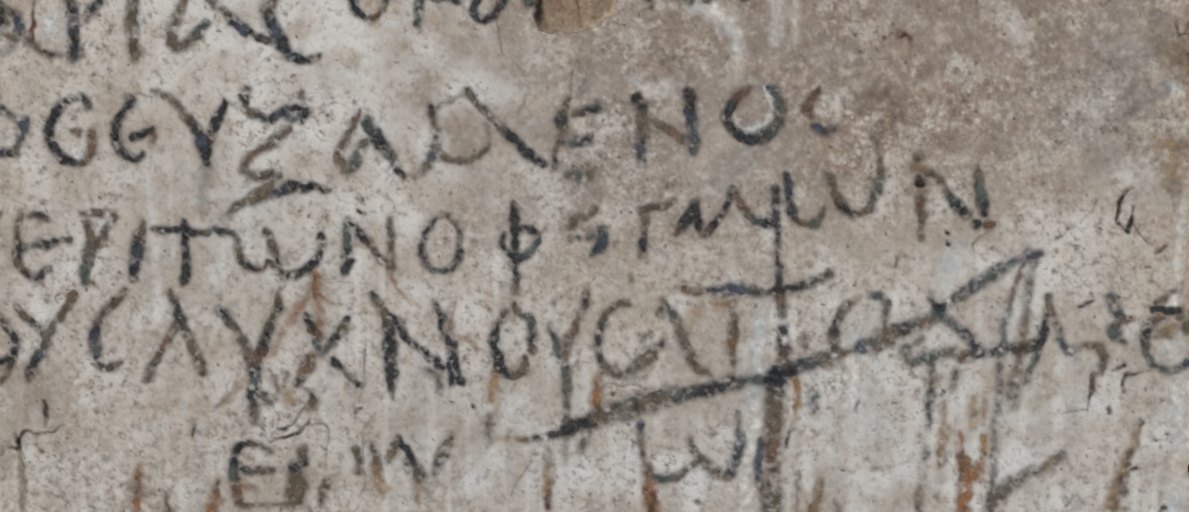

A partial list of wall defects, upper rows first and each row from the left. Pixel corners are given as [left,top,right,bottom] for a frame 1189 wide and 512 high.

spalling [533,0,618,34]